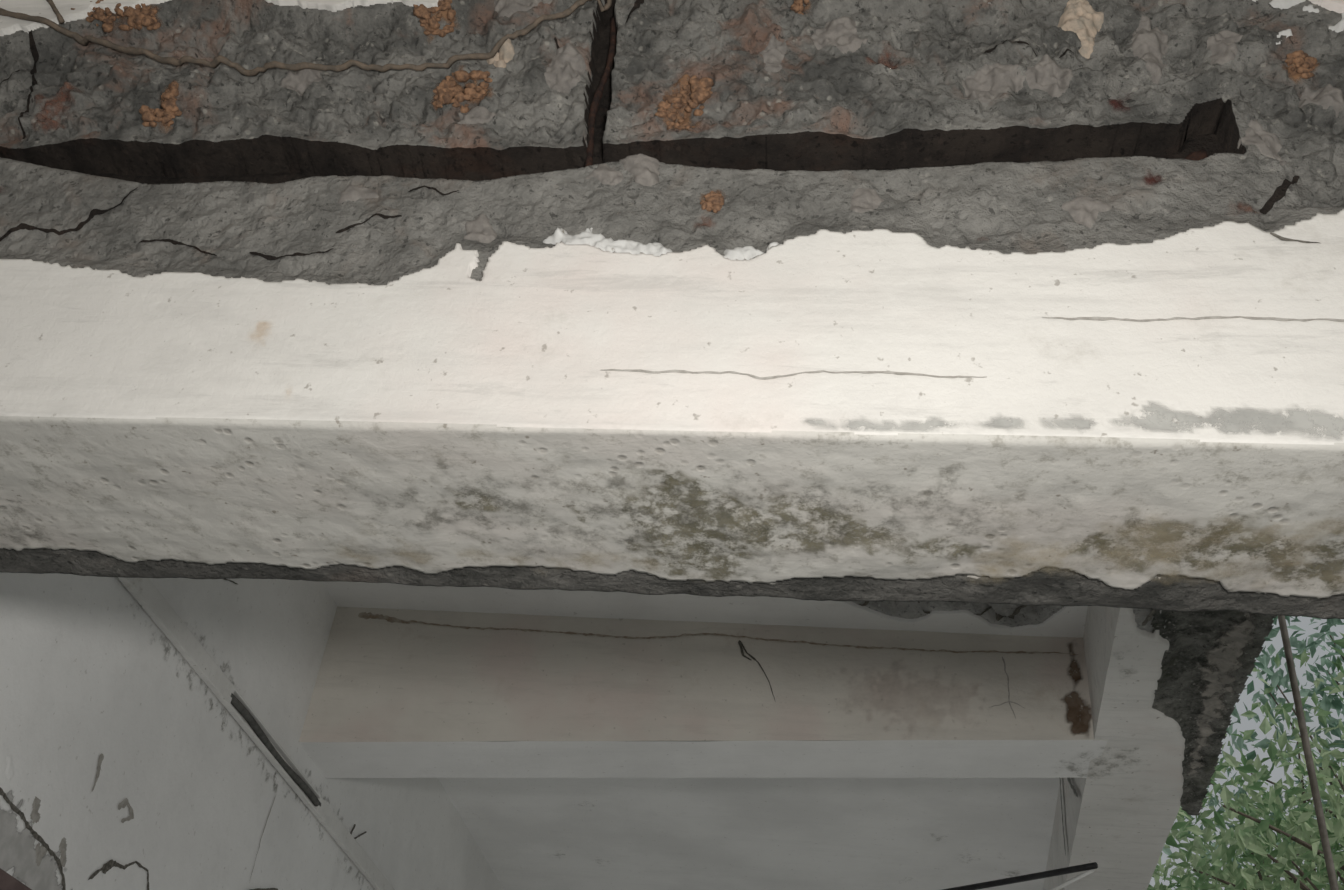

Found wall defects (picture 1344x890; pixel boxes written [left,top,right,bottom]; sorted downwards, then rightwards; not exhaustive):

spalling [0,0,1344,285]
crack [1043,315,1344,323]
crack [601,369,987,380]
flaking render [848,419,947,430]
flaking render [987,418,1022,428]
flaking render [1050,418,1095,429]
flaking render [1116,403,1344,438]
water stain [746,496,889,554]
water stain [910,539,979,560]
water stain [1270,532,1344,589]
flaking render [0,548,1344,816]
peeling [0,754,73,890]